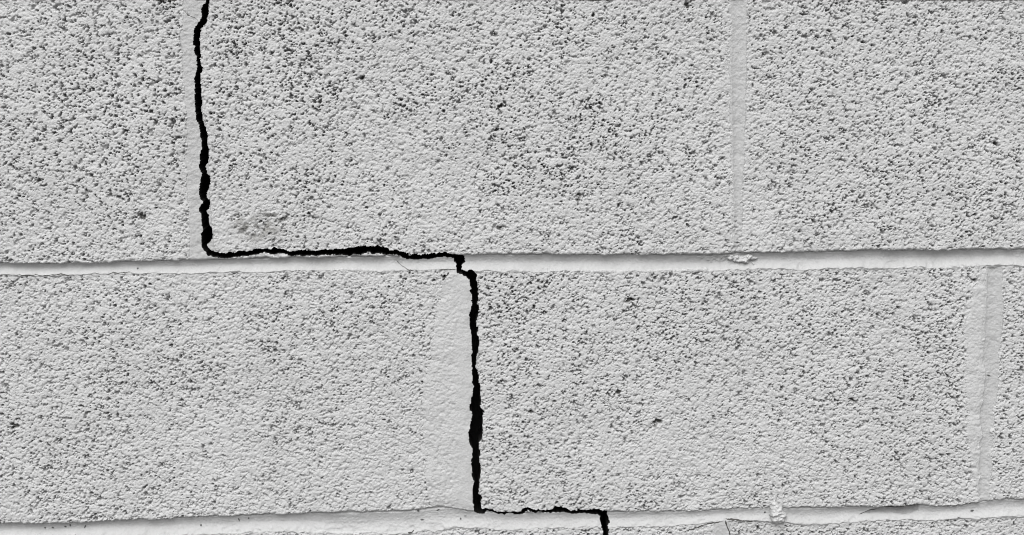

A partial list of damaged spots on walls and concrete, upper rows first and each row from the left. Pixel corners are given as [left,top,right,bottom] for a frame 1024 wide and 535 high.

crack [154,0,610,535]